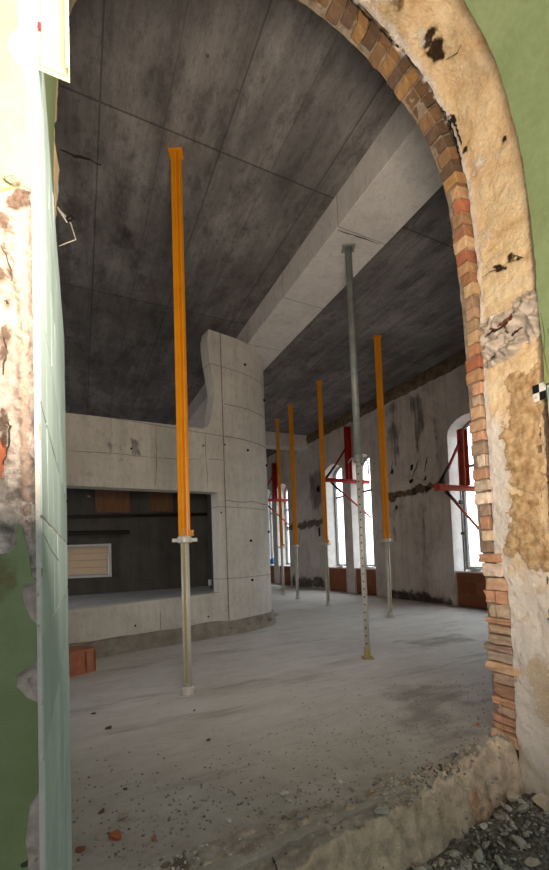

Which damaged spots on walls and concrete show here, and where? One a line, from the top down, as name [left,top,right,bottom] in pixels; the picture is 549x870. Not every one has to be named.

spalling [8,0,35,92]
peeling [356,0,409,56]
spalling [478,290,543,369]
spalling [0,174,43,627]
peeling [499,360,549,584]